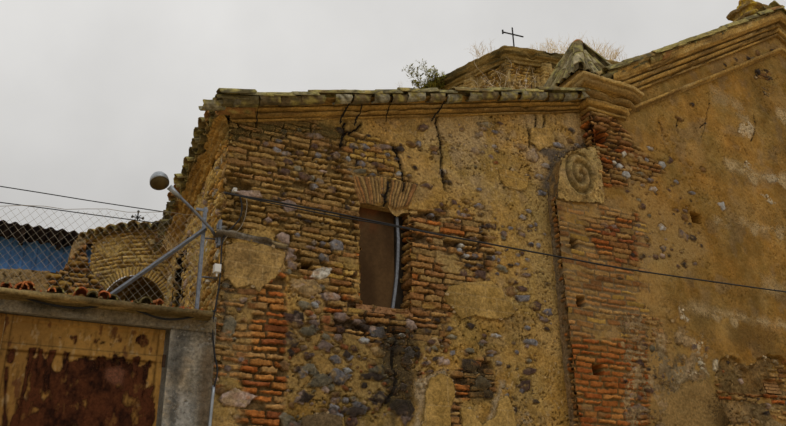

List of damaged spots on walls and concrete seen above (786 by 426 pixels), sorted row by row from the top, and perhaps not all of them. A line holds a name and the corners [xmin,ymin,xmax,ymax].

crack [339,96,363,149]
crack [431,93,449,183]
corrosion [2,335,155,426]
crack [384,328,398,404]
spalling [617,306,786,426]